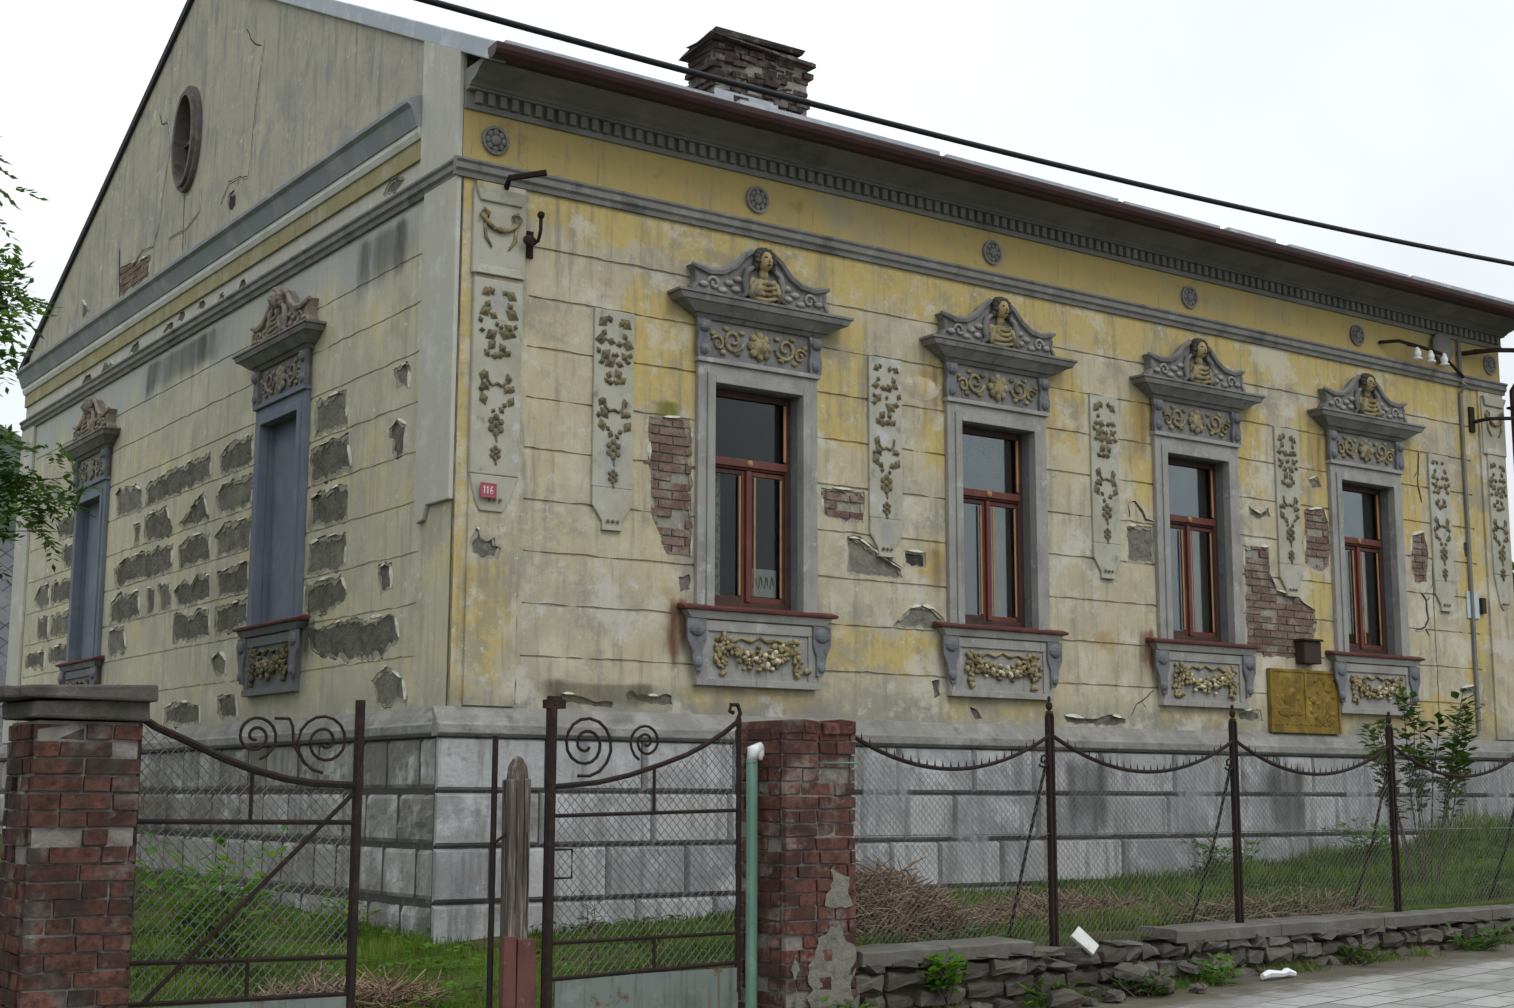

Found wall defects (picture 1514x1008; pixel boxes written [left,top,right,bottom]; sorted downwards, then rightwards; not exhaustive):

flaking render [120,255,151,297]
peeling [107,434,254,729]
peeling [303,390,408,710]
flaking render [644,415,695,592]
peeling [820,485,925,579]
peeling [1125,524,1154,566]
spalling [1248,507,1271,520]
flaking render [1242,544,1318,659]
flaking render [1408,531,1429,584]